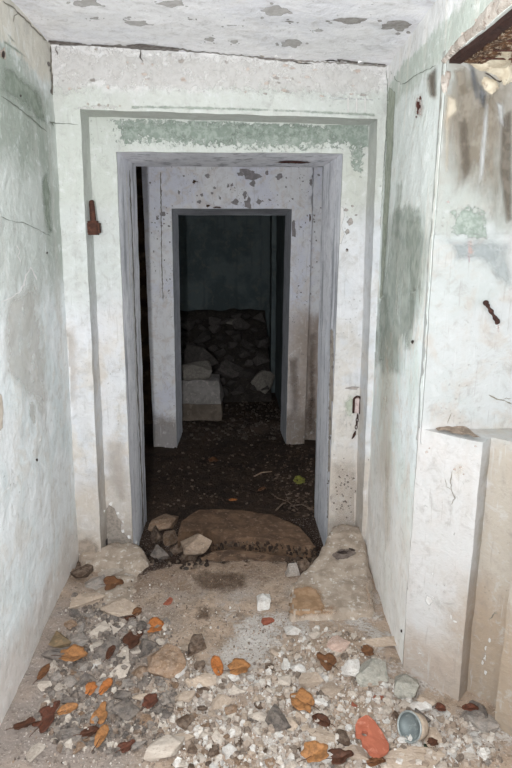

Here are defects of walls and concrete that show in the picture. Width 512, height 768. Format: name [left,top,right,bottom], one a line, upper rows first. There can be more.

flaking render [155,0,187,8]
flaking render [261,3,298,24]
flaking render [310,18,367,32]
flaking render [378,20,411,35]
flaking render [275,39,308,48]
spalling [441,0,512,95]
crack [2,1,436,229]
peeling [227,169,287,209]
leakage [379,88,421,370]